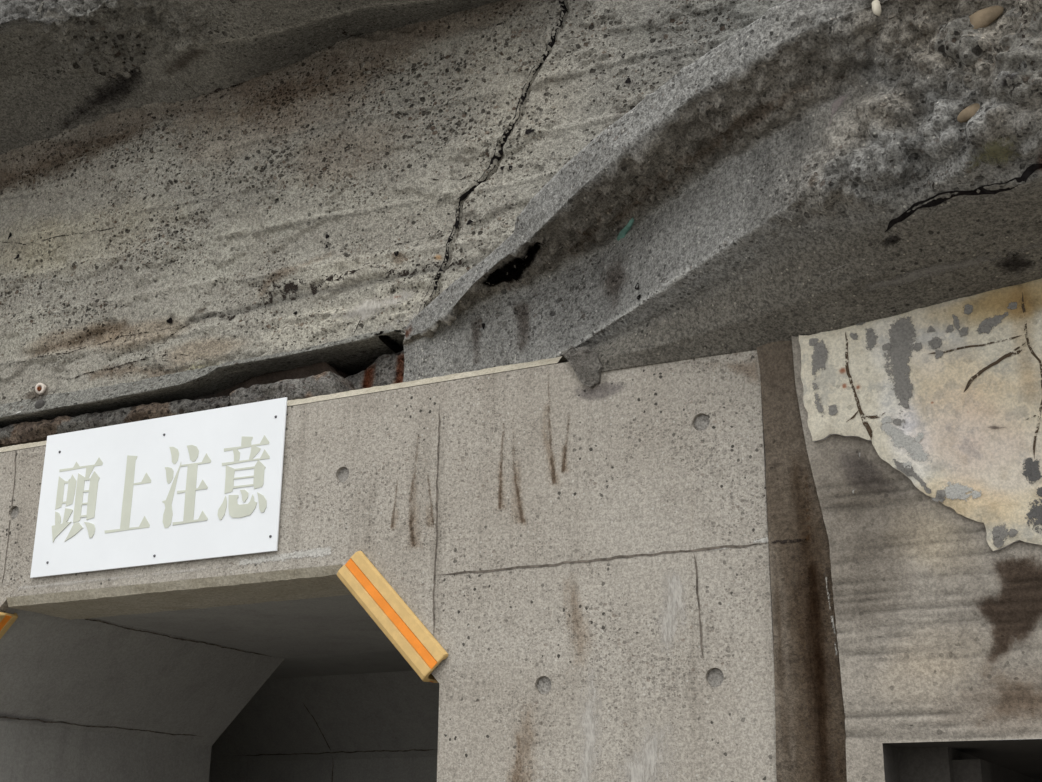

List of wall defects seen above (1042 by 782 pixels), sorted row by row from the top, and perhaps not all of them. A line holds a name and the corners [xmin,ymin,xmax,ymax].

spalling [35,0,149,82]
crack [218,0,568,321]
crack [884,164,1042,233]
crack [14,325,212,380]
peeling [809,338,838,417]
peeling [850,302,1017,503]
peeling [992,458,1042,548]
water stain [981,559,1042,657]